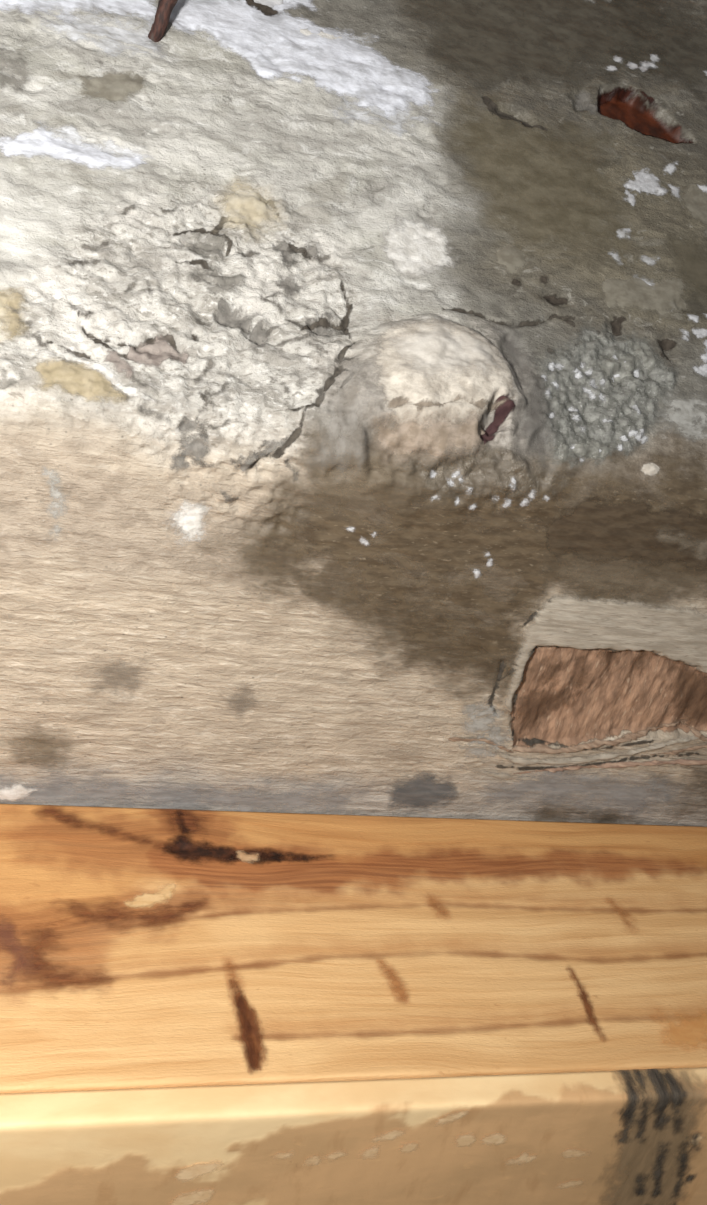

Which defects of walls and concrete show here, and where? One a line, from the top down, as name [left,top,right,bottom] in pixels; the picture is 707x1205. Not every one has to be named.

efflorescence [0,122,150,169]
crack [122,194,279,282]
efflorescence [0,0,436,134]
leakage [465,116,627,247]
leakage [411,0,707,100]
rust [597,87,655,115]
crack [2,242,355,480]
leakage [245,431,707,695]